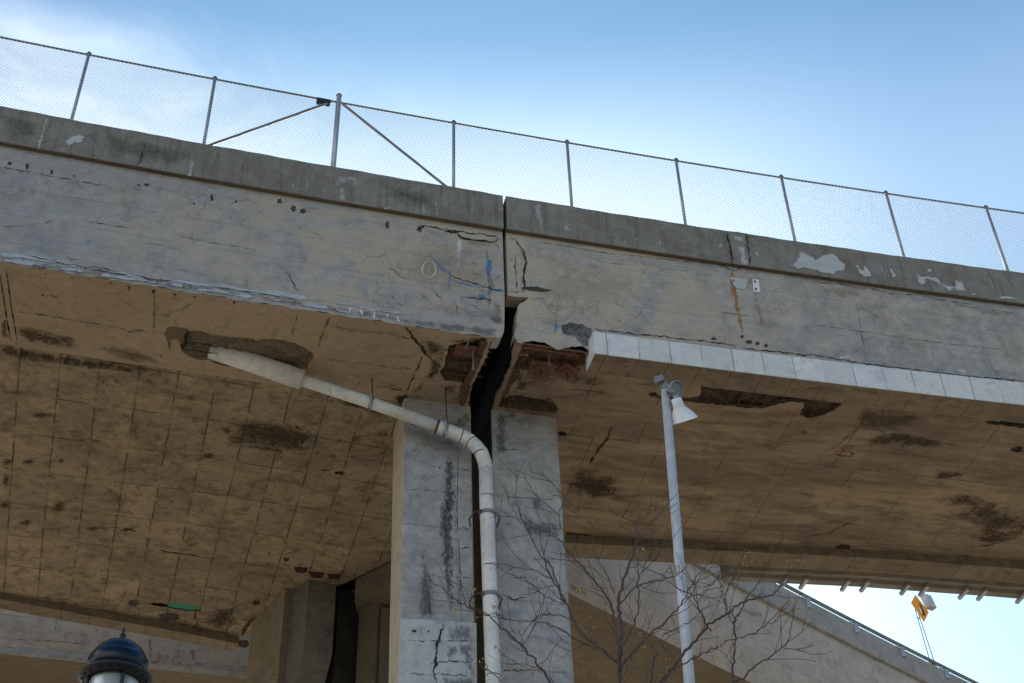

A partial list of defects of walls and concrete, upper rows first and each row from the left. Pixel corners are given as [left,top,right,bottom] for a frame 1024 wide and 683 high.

peeling [0,252,412,315]
peeling [790,252,871,277]
peeling [917,269,976,295]
crack [343,225,751,398]
spalling [498,368,558,413]
spalling [648,386,843,418]
damp [225,423,313,452]
damp [862,413,940,447]
damp [570,471,619,498]
damp [440,460,456,605]
damp [953,495,1024,543]
crack [403,462,475,683]